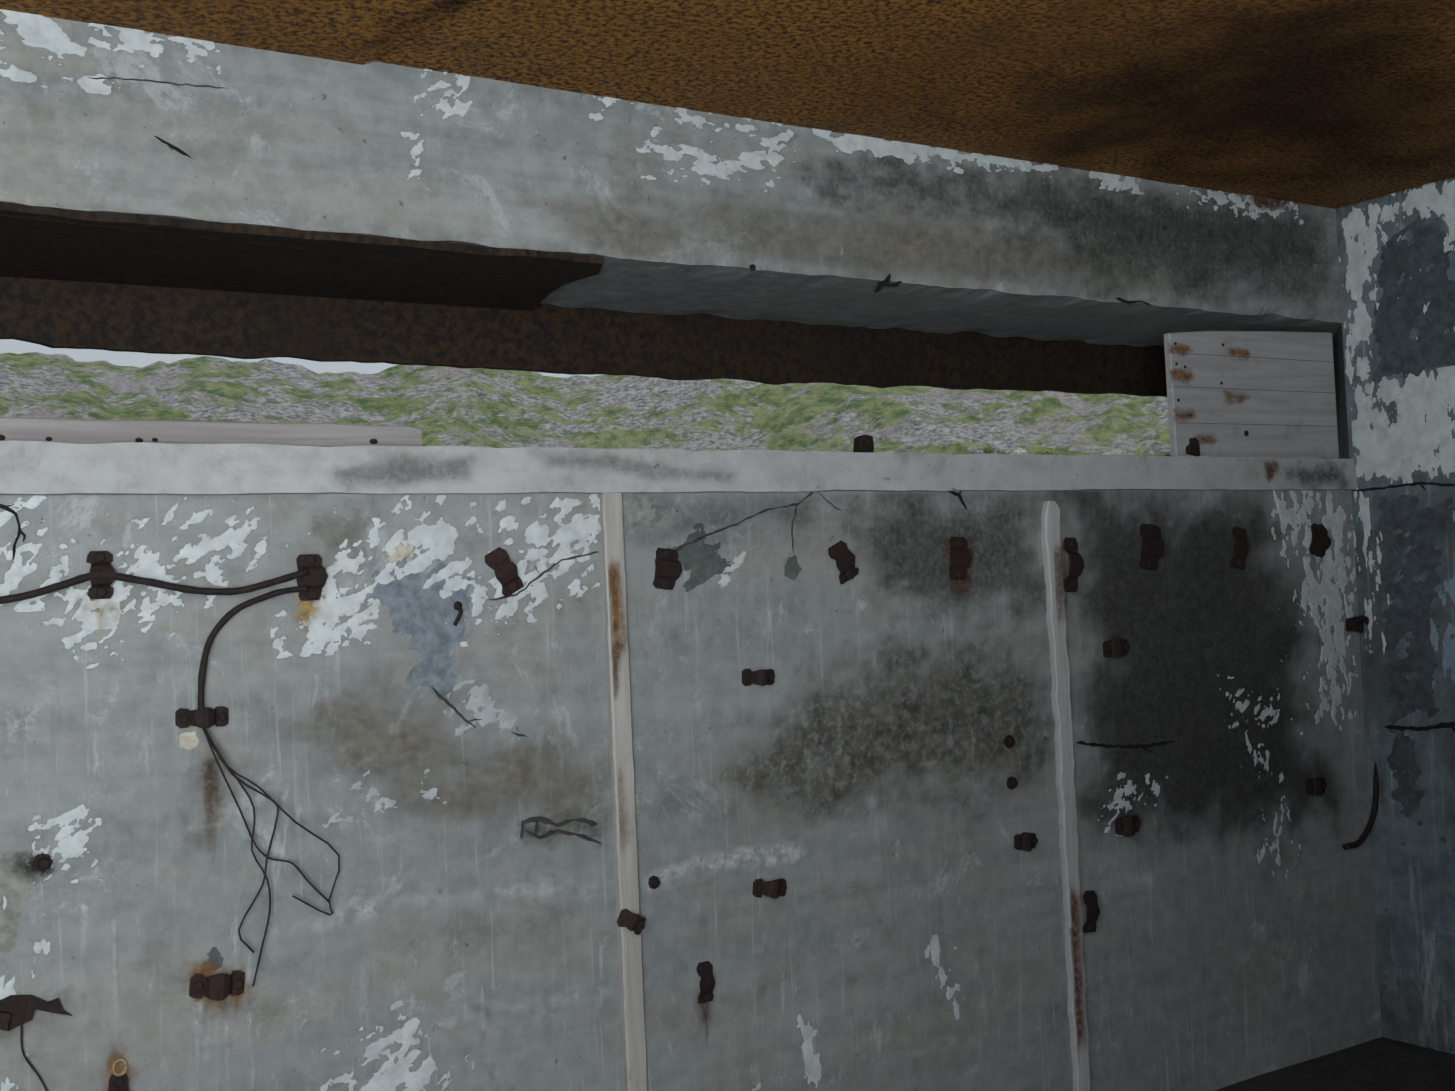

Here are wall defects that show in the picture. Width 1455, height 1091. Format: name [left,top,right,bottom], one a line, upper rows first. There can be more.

peeling [0,9,221,96]
peeling [588,95,634,121]
peeling [636,107,796,192]
peeling [812,128,1059,178]
damp [874,156,1323,293]
corrosion [1170,345,1192,380]
peeling [0,495,272,669]
corrosion [609,565,624,688]
damp [1077,492,1337,825]
peeling [320,1000,452,1091]